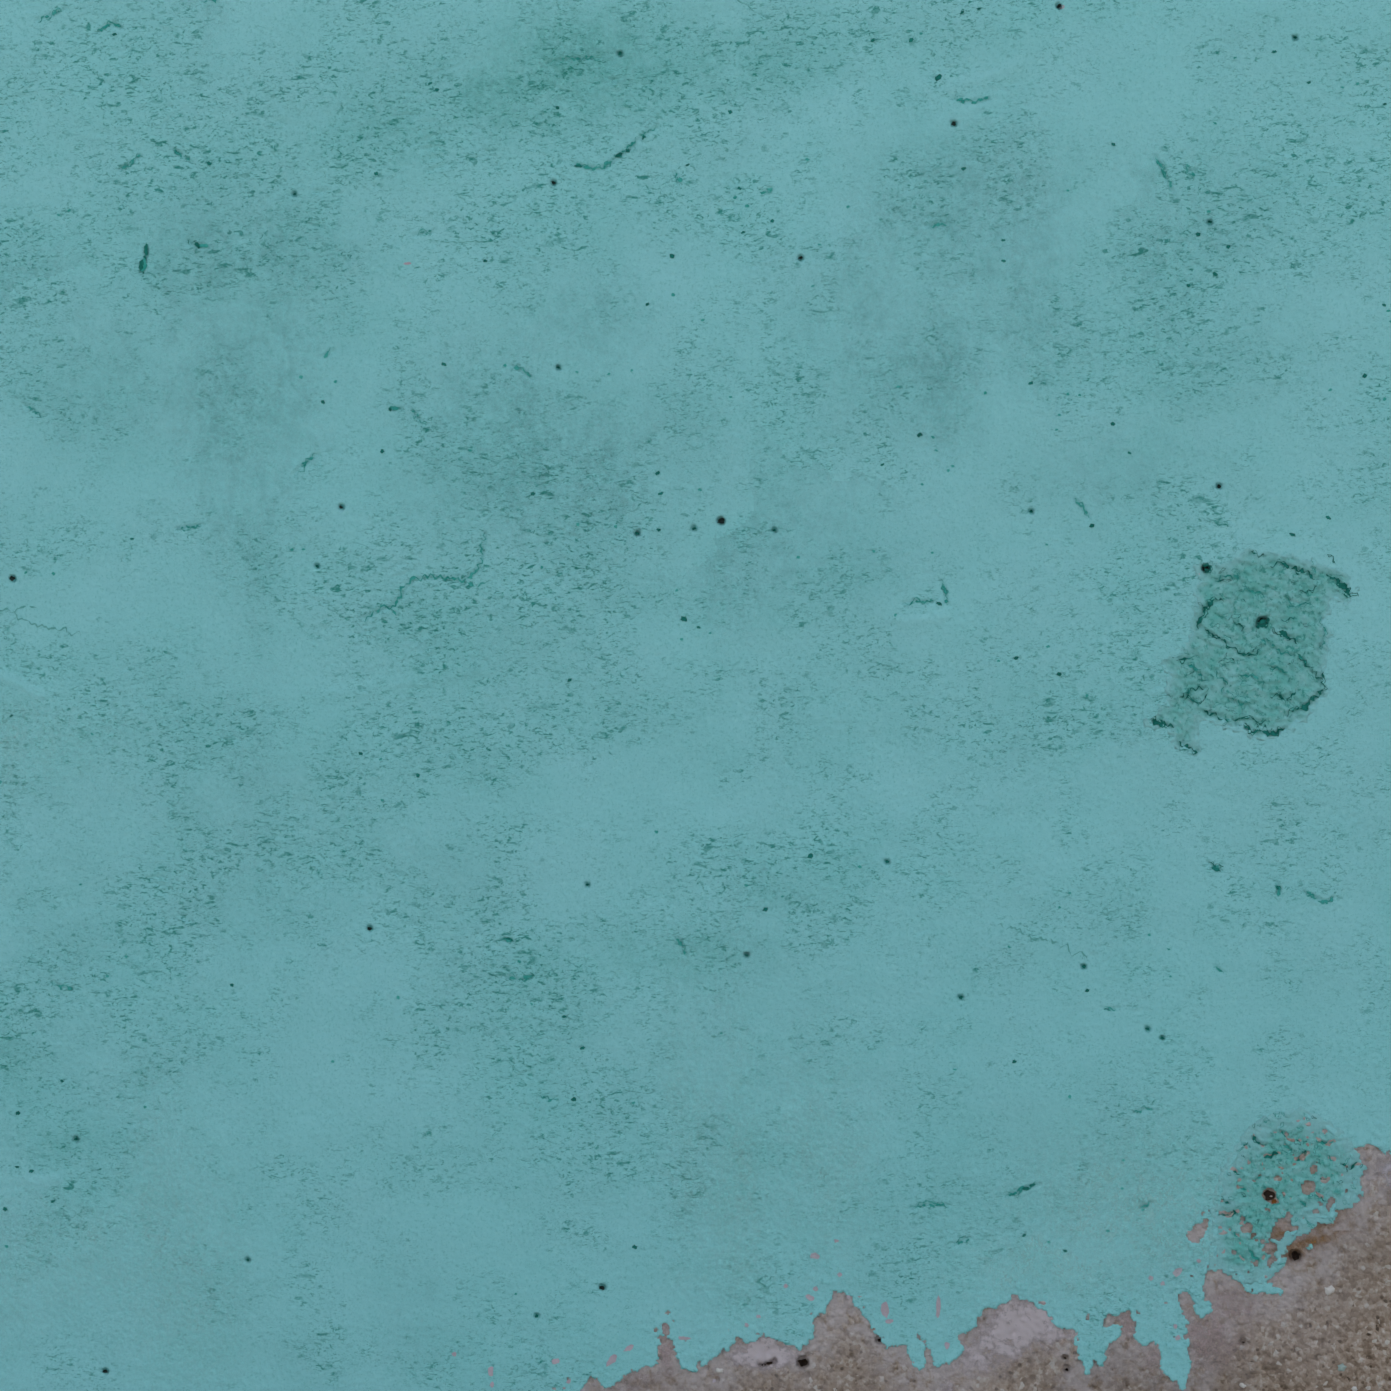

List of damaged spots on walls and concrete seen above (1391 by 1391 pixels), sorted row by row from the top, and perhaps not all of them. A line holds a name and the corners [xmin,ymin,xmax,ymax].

peeling [552,1106,1391,1391]